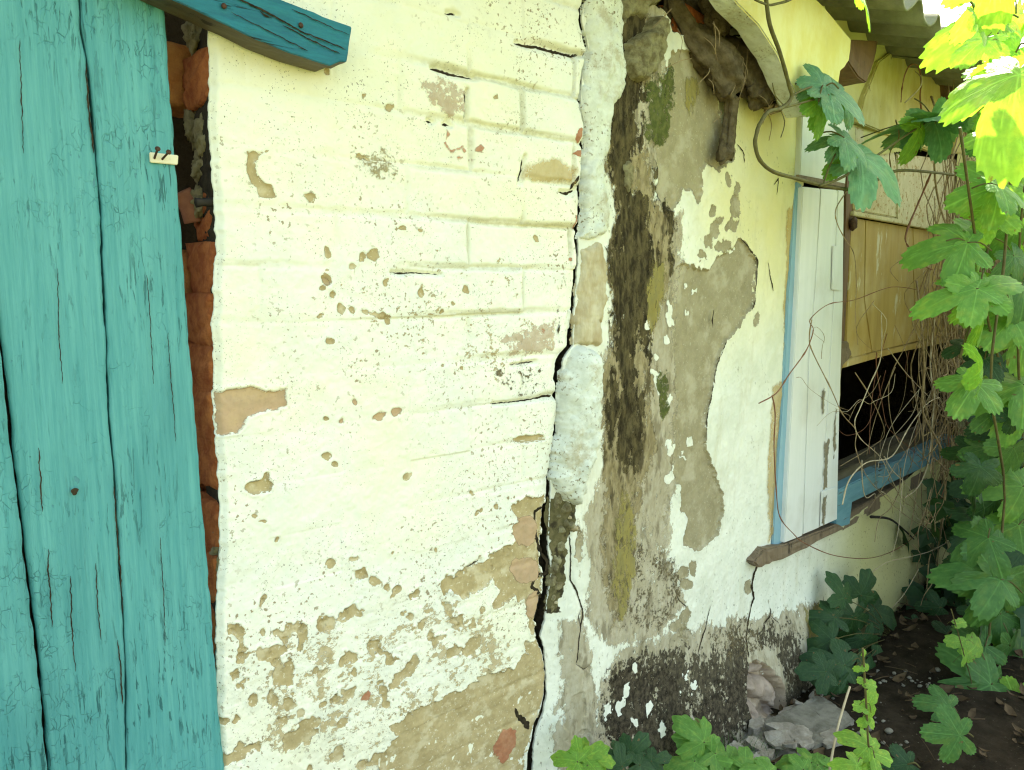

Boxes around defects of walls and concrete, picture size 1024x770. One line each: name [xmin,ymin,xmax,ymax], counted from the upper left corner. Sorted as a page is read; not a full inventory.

leakage [622,5,666,52]
peeling [421,76,484,158]
flaking render [650,49,760,590]
flaking render [214,387,287,435]
leakage [549,59,824,766]
flaking render [245,472,274,495]
flaking render [223,492,611,770]
crack [530,506,588,670]
peeling [669,606,692,645]
crack [746,567,779,657]
peeling [219,714,241,725]
crack [515,708,530,729]